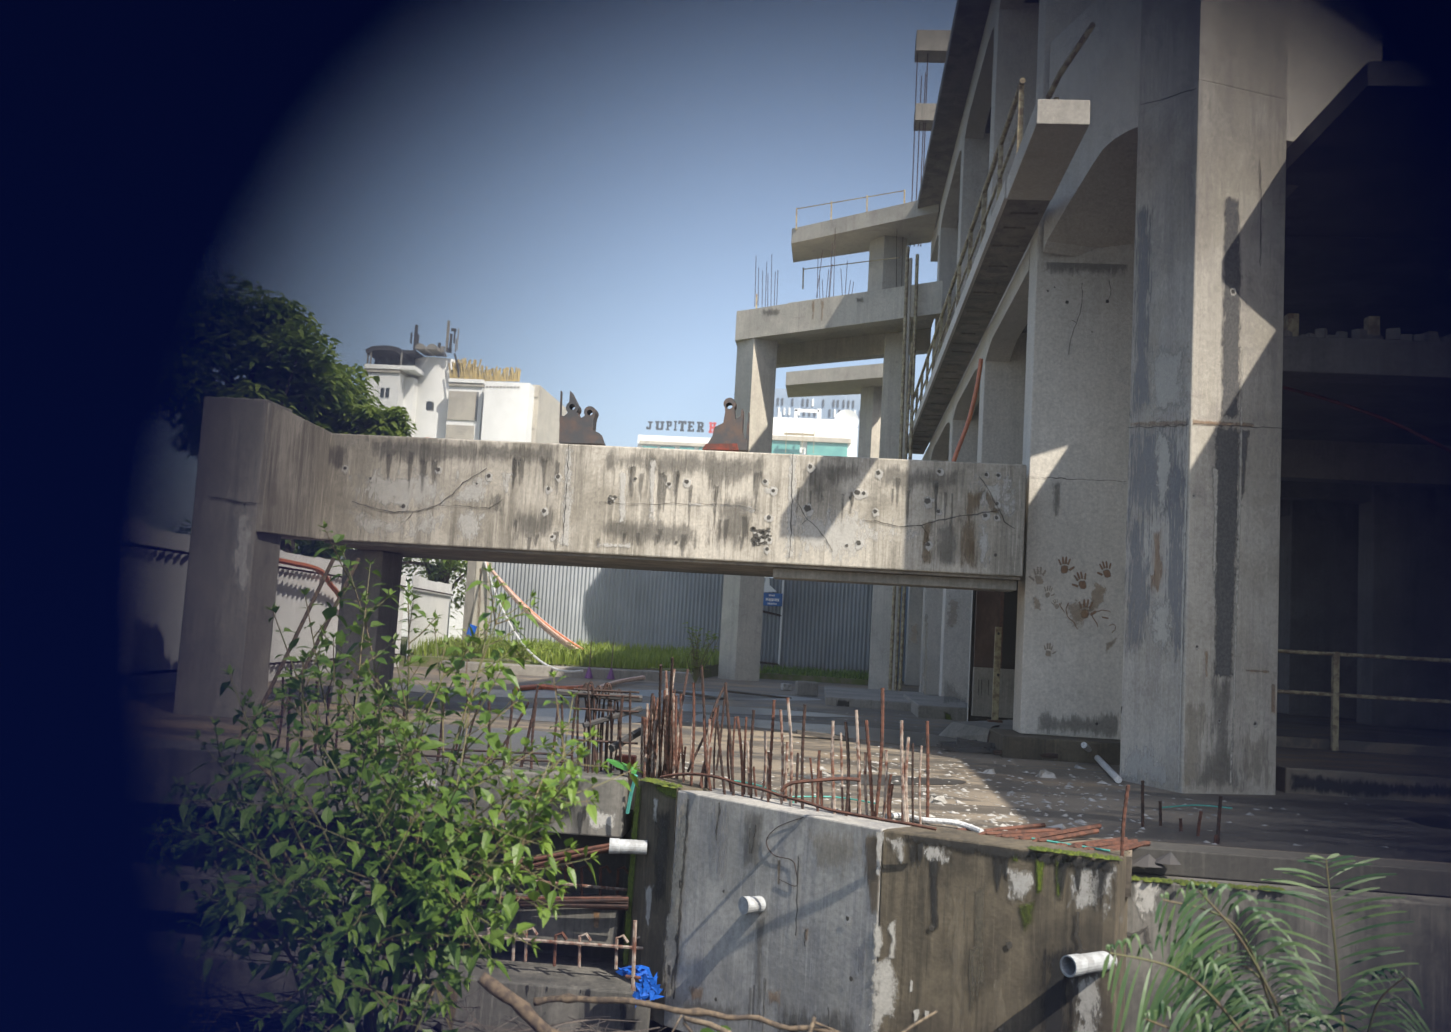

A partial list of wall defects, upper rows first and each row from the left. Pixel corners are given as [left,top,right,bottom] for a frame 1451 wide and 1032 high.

water stain [560,447,573,545]
water stain [765,455,914,561]
water stain [979,476,1015,568]
flaking render [1154,431,1171,513]
water stain [1214,227,1250,783]
spalling [373,657,949,996]
water stain [865,836,880,912]
water stain [905,835,1114,1012]
flaking render [958,780,1223,909]
flaking render [1135,883,1159,917]
water stain [1041,949,1101,1032]